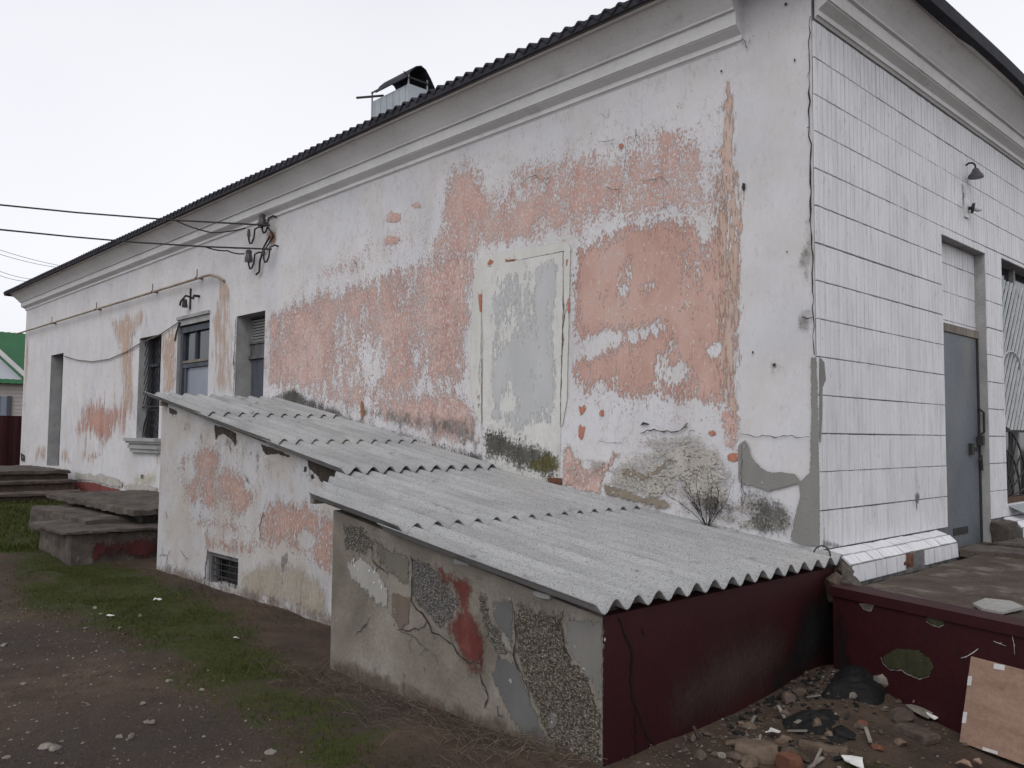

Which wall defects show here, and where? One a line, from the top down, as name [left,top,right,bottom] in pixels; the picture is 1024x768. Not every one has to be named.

crack [802,16,815,355]
peeling [76,312,146,441]
peeling [212,283,230,389]
peeling [178,425,459,629]
leakage [275,387,559,482]
peeling [261,81,792,535]
crack [601,423,693,443]
leakage [682,490,790,533]
crack [372,556,501,716]
flaking render [476,591,604,766]